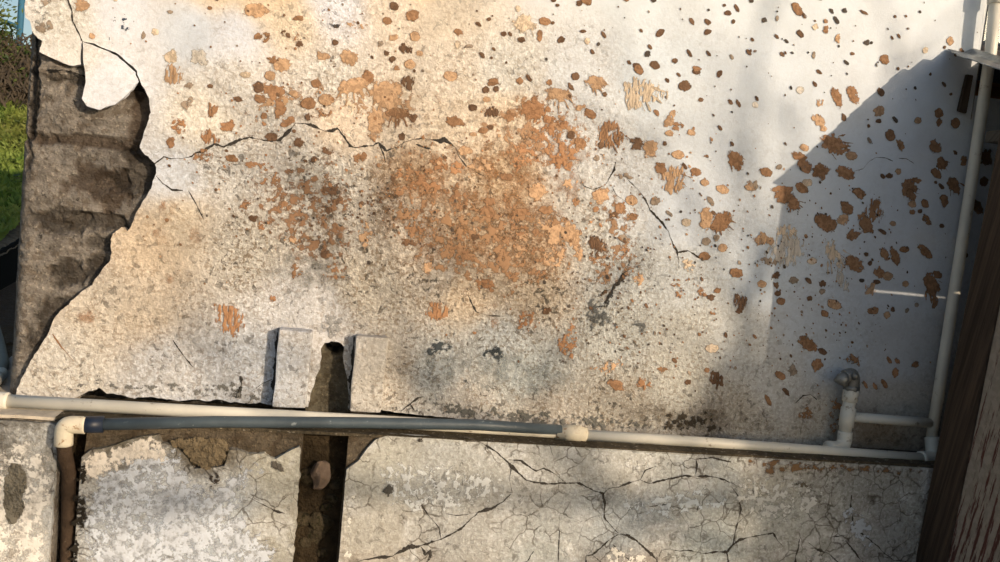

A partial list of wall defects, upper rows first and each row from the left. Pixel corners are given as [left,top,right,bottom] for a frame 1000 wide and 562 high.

crack [67,0,83,41]
spalling [10,32,156,395]
corrosion [246,159,352,278]
crack [154,123,483,219]
corrosion [340,82,420,131]
corrosion [382,165,570,296]
corrosion [482,96,598,183]
crack [578,162,700,260]
crack [600,261,630,304]
damp [69,459,88,562]
crack [358,436,912,562]